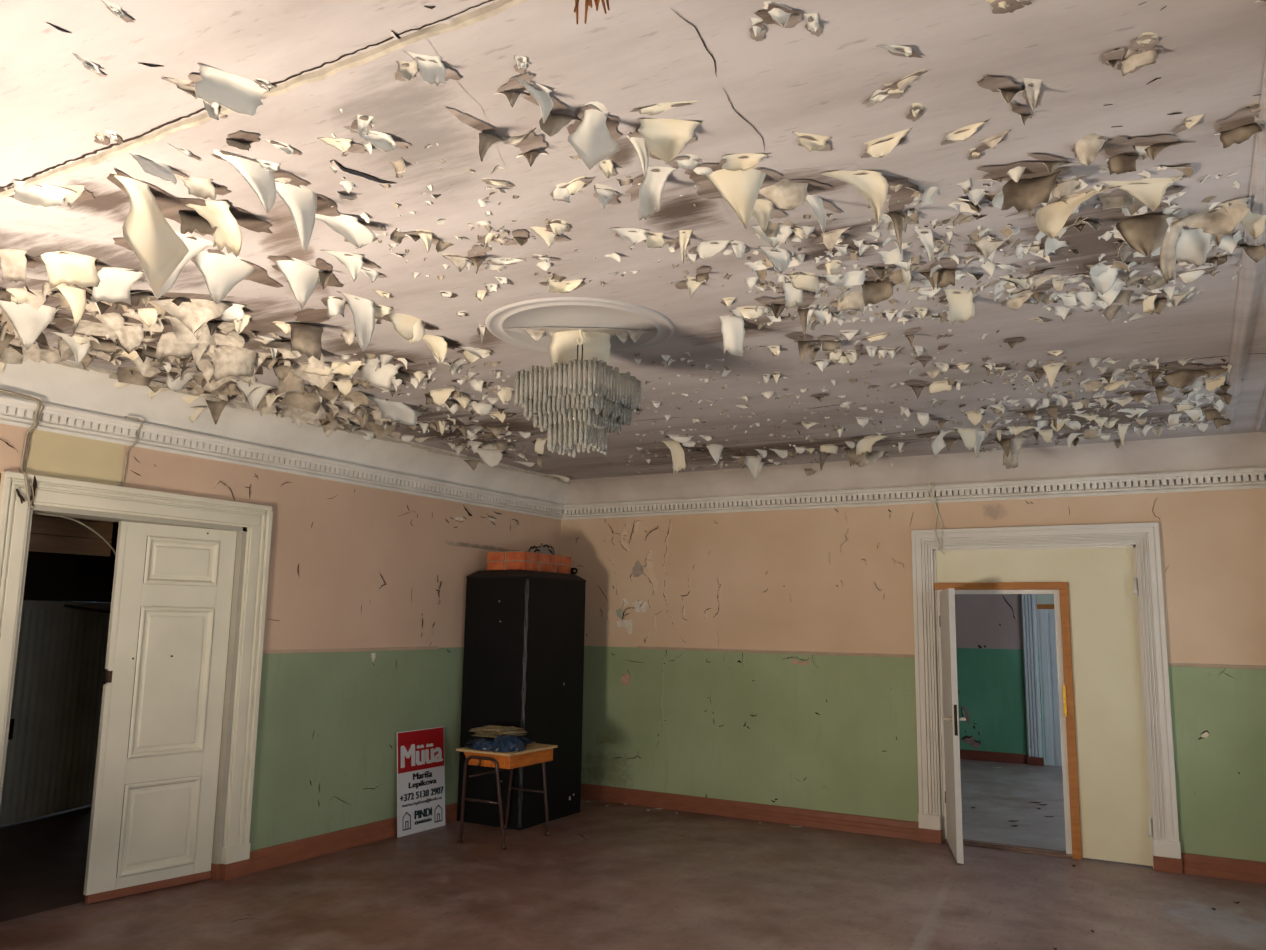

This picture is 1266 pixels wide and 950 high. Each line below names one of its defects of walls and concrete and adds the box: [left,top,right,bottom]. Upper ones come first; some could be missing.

peeling [101,0,135,23]
peeling [749,1,821,42]
peeling [985,0,1032,14]
peeling [1101,32,1160,76]
crack [672,9,765,152]
peeling [0,45,1266,483]
spalling [605,518,663,635]